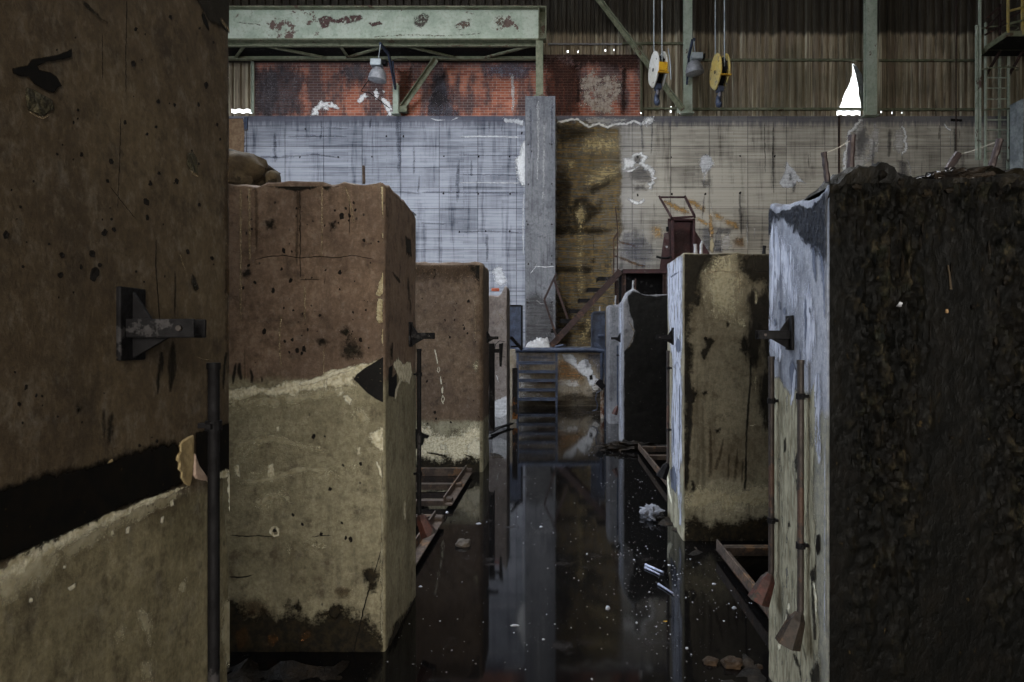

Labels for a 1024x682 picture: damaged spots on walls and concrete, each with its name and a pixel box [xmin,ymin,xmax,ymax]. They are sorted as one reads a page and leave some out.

efflorescence [312,101,339,115]
efflorescence [358,89,392,116]
crack [256,191,371,283]
spalling [351,273,383,349]
damp [393,236,480,311]
efflorescence [493,267,506,285]
damp [485,138,532,254]
damp [495,71,656,437]
rust [664,200,743,252]
peeling [176,435,207,486]
damp [643,225,825,682]
spalling [369,427,383,638]